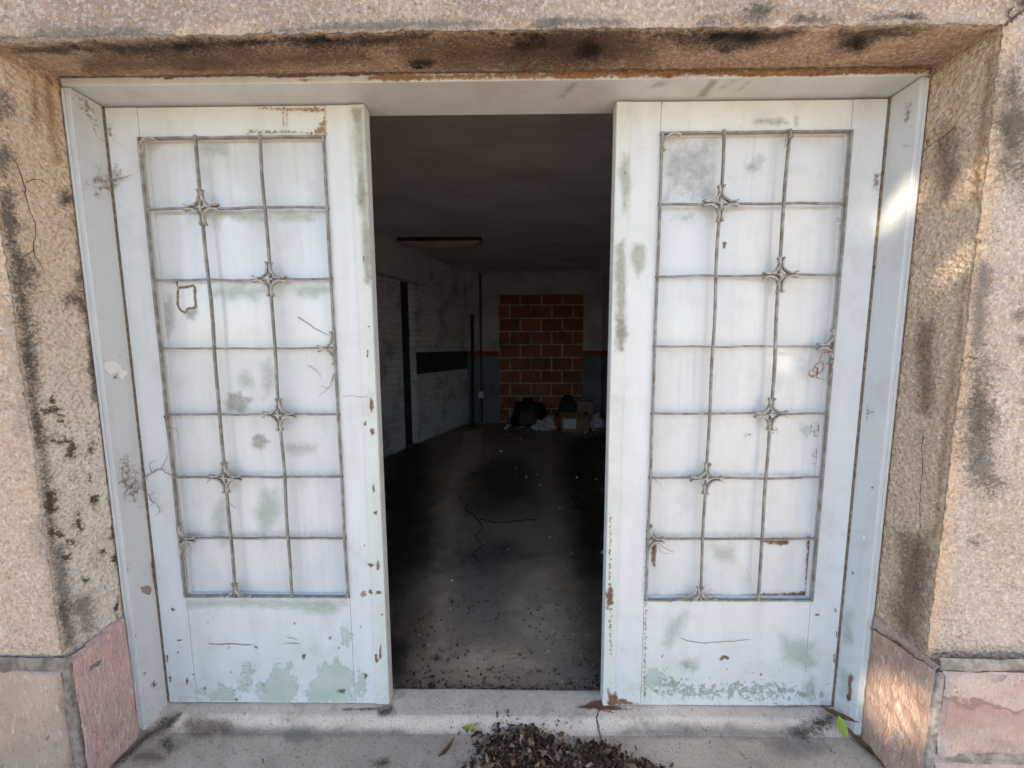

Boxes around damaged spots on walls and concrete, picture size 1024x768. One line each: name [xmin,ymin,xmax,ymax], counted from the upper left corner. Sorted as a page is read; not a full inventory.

leakage [0,0,934,71]
rust [143,67,931,82]
leakage [986,65,1024,208]
crack [0,149,45,271]
leakage [0,144,94,648]
leakage [88,341,96,401]
leakage [954,259,1006,499]
rust [606,517,614,655]
rust [754,537,810,595]
peeling [186,626,367,703]
rust [579,596,648,711]
peeling [644,655,830,705]